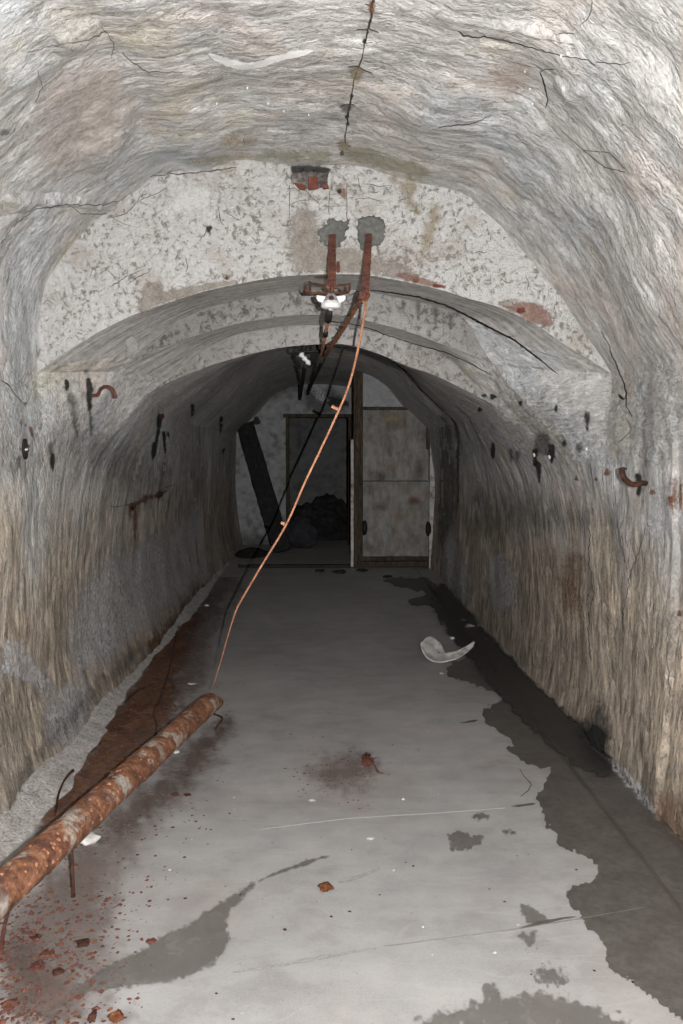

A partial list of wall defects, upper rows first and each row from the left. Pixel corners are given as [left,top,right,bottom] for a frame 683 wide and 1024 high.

crack [27,26,183,103]
crack [336,0,379,156]
crack [458,2,630,108]
crack [0,167,236,244]
spalling [290,165,346,198]
crack [370,290,556,373]
crack [601,331,632,443]
corrosion [129,490,166,541]
leakage [384,422,683,1024]
leakage [267,856,326,878]
leakage [79,883,254,994]